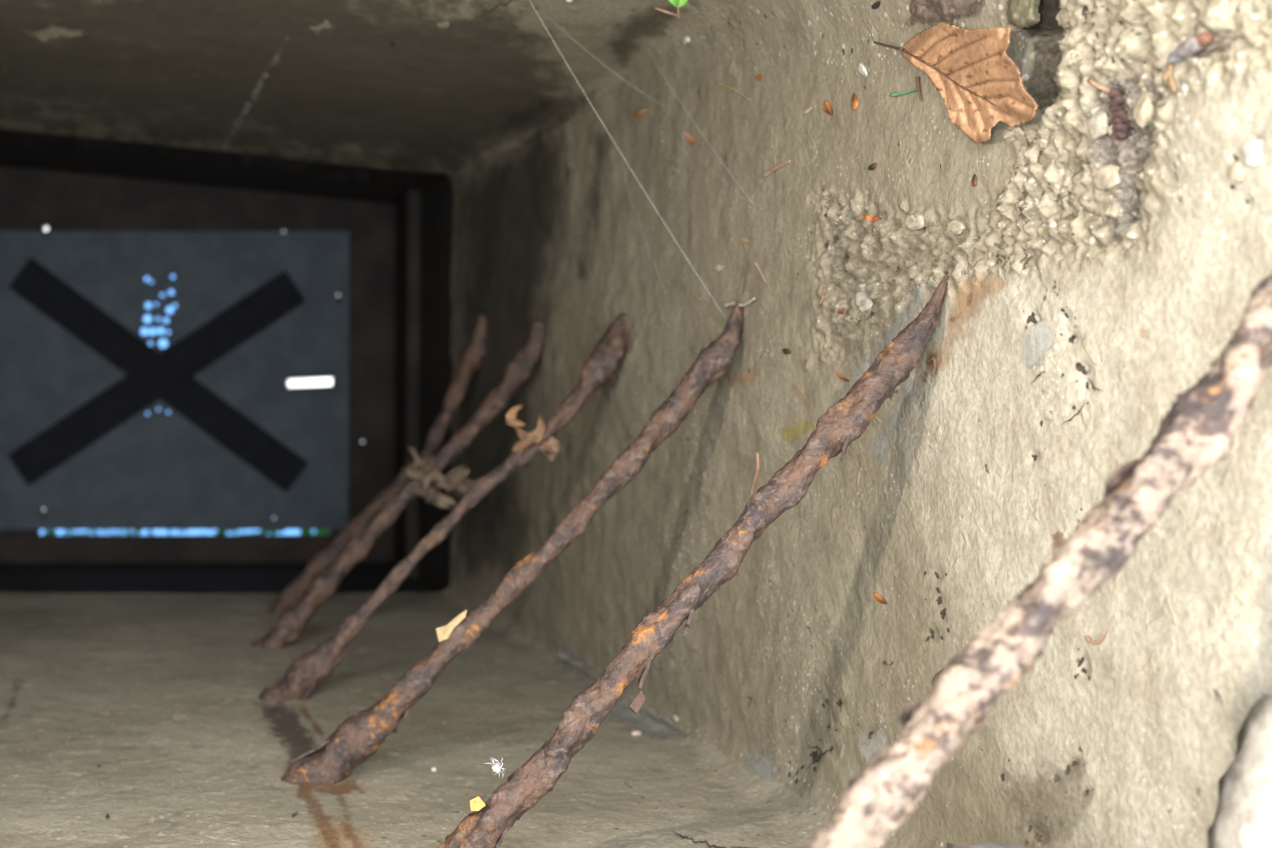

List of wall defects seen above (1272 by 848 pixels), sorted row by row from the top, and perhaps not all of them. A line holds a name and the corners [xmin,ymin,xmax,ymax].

spalling [1002,0,1161,241]
spalling [1227,136,1264,189]
leakage [0,0,558,565]
corrosion [949,278,1002,326]
corrosion [1104,459,1139,498]
corrosion [264,703,364,764]
corrosion [899,698,925,728]
corrosion [294,777,363,848]